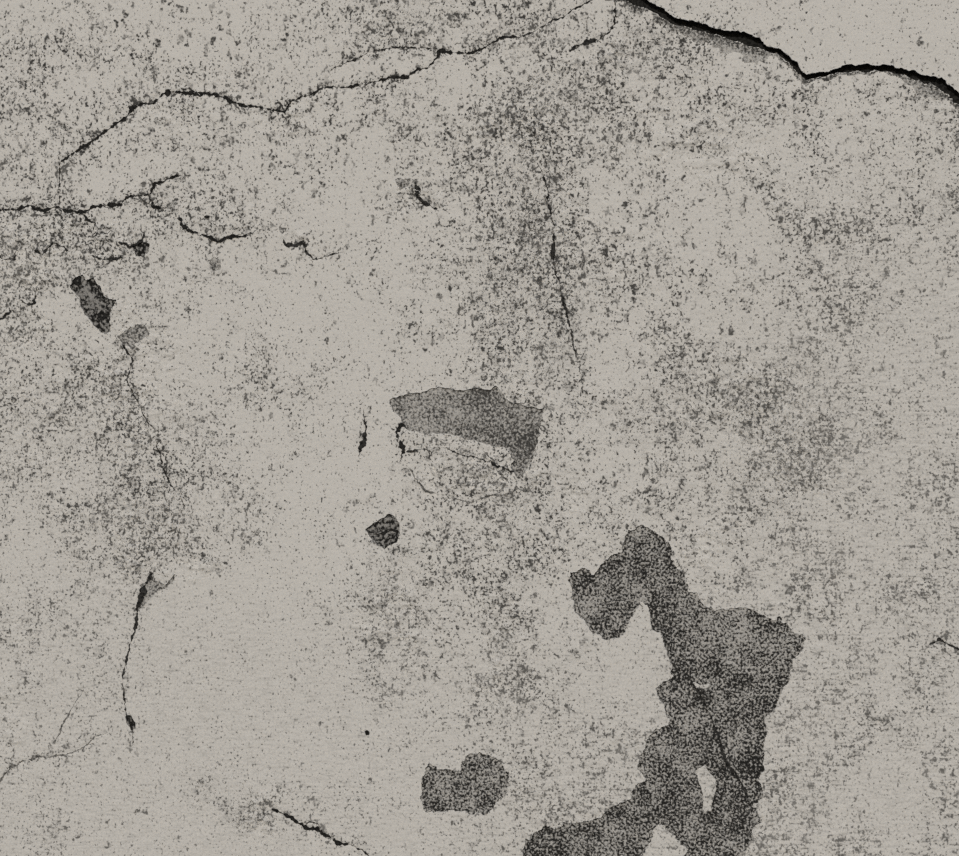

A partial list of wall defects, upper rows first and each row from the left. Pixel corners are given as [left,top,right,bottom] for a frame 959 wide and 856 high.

crack [0,0,959,224]
crack [283,239,338,260]
spalling [390,386,544,479]
crack [122,573,152,745]
spalling [523,525,806,856]
spalling [420,752,509,815]
crack [271,808,369,856]